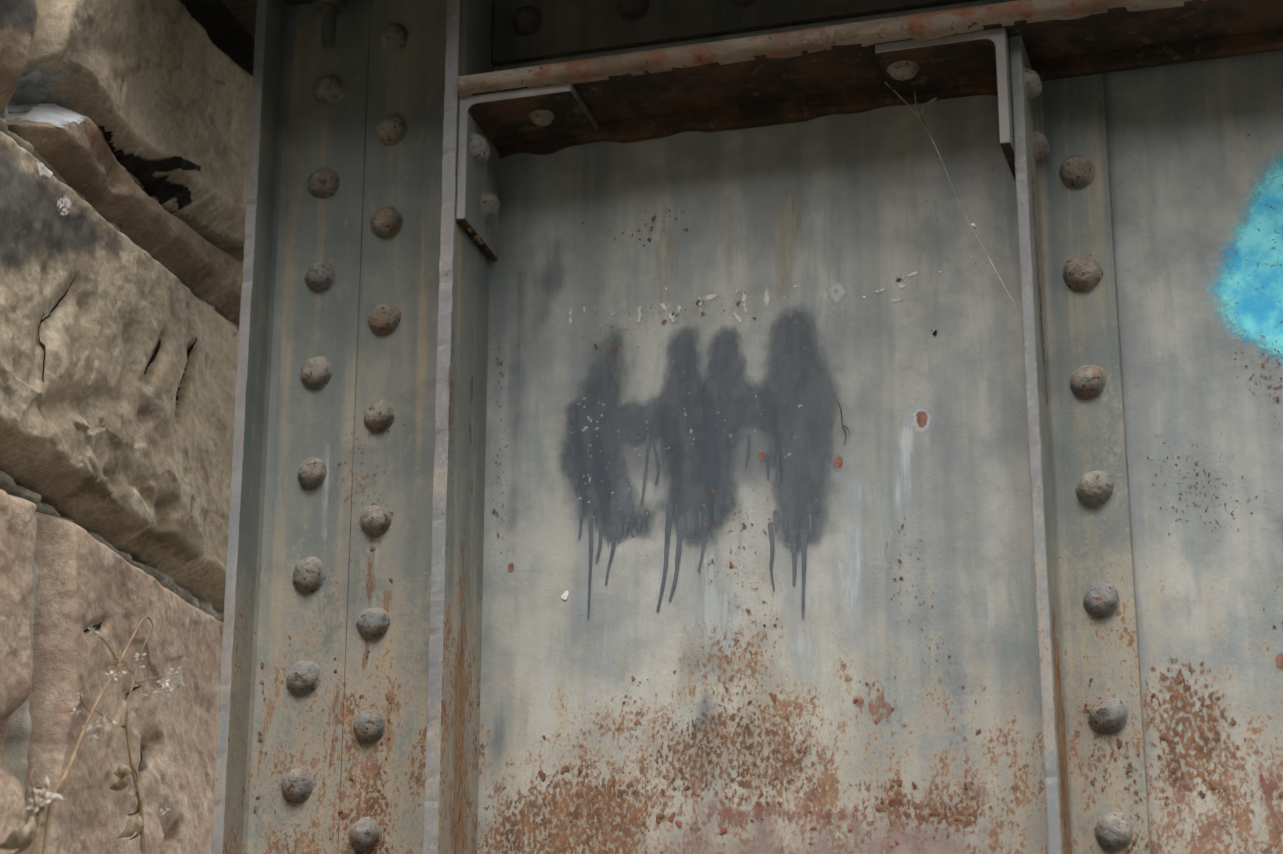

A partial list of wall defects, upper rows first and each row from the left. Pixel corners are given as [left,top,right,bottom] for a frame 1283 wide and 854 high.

crack [38,277,76,382]
corrosion [491,333,514,571]
corrosion [910,408,931,432]
corrosion [366,541,393,612]
corrosion [257,662,272,777]
corrosion [253,689,396,854]
corrosion [450,489,992,854]
corrosion [1088,658,1246,854]
corrosion [1254,762,1283,832]